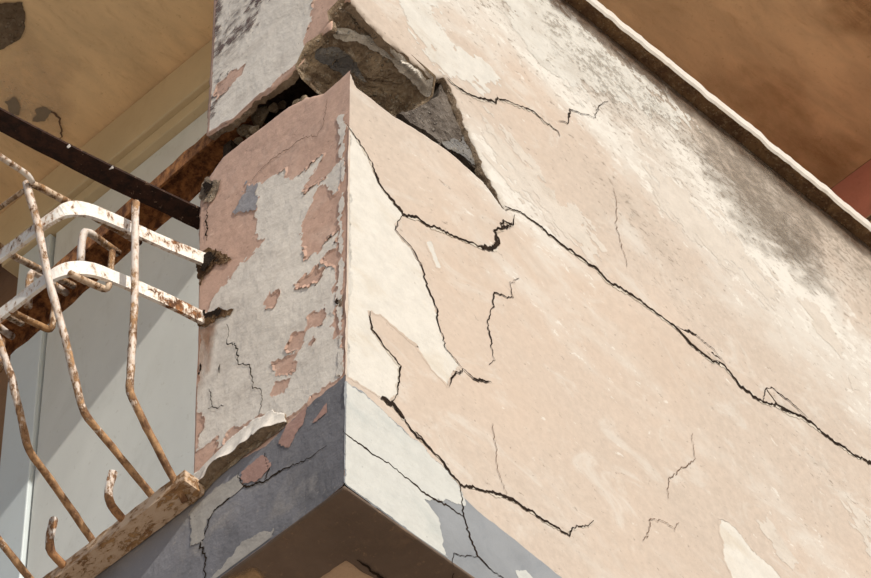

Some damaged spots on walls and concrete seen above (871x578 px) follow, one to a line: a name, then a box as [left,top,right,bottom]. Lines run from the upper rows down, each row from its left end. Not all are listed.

peeling [0,2,25,50]
peeling [209,0,608,276]
crack [448,79,607,135]
crack [198,325,262,412]
peeling [188,114,466,556]
crack [346,125,871,464]
crack [343,311,594,578]
peeling [211,528,274,578]
crack [199,445,327,578]
peeling [717,517,799,578]